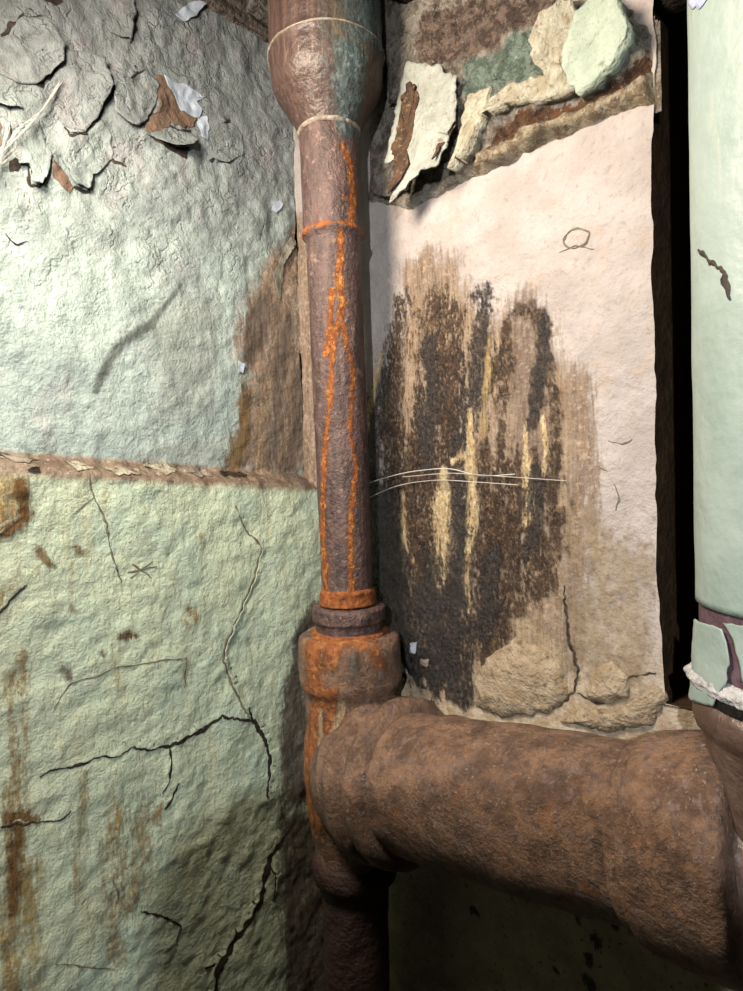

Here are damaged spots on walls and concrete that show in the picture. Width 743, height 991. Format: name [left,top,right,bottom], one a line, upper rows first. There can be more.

crack [13,154,53,188]
crack [35,48,65,88]
crack [64,0,145,137]
peeling [0,16,210,194]
flaking render [368,0,662,210]
leakage [225,214,317,488]
rust [0,474,33,539]
leakage [366,248,655,712]
rust [9,652,26,687]
crack [36,501,278,810]
peeling [688,619,743,707]
rust [0,704,42,991]